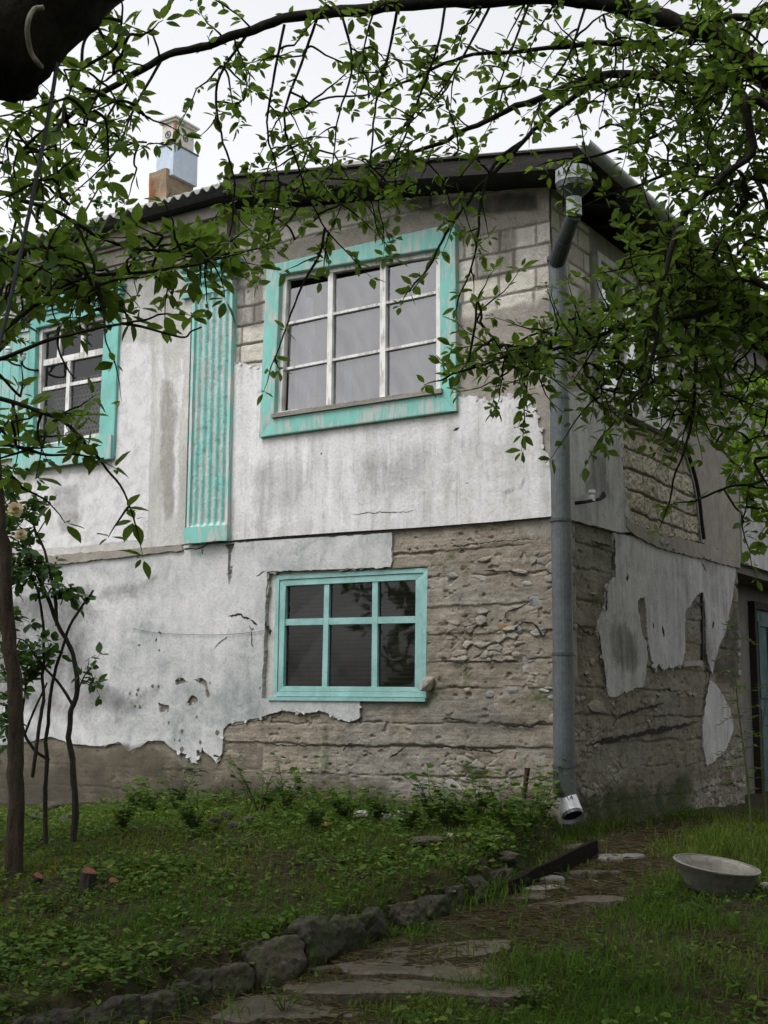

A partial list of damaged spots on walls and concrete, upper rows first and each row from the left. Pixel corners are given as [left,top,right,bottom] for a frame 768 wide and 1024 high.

crack [185,510,537,554]
crack [215,613,272,647]
crack [575,538,714,746]
spalling [173,676,211,718]
flaking render [215,517,746,830]
spalling [160,702,203,760]